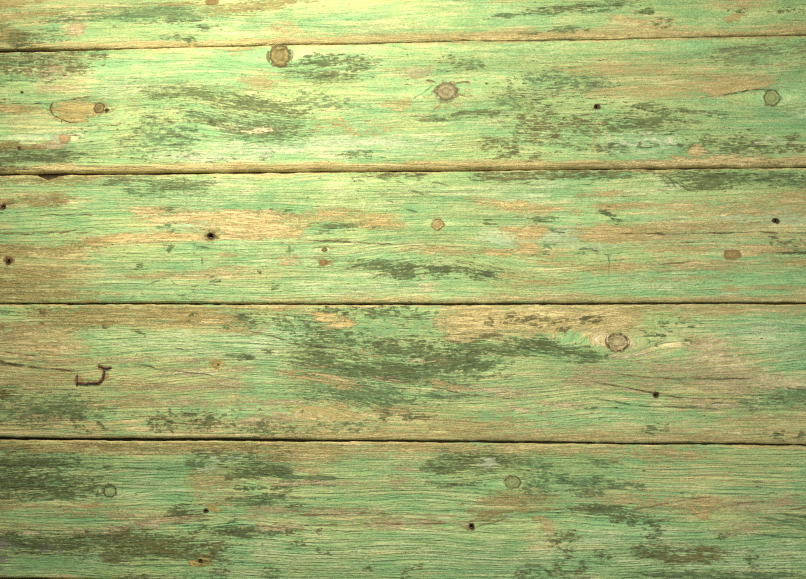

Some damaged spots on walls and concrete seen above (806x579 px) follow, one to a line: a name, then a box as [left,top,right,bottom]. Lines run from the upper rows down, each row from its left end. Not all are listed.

peeling [589,122,806,167]
peeling [0,182,806,579]